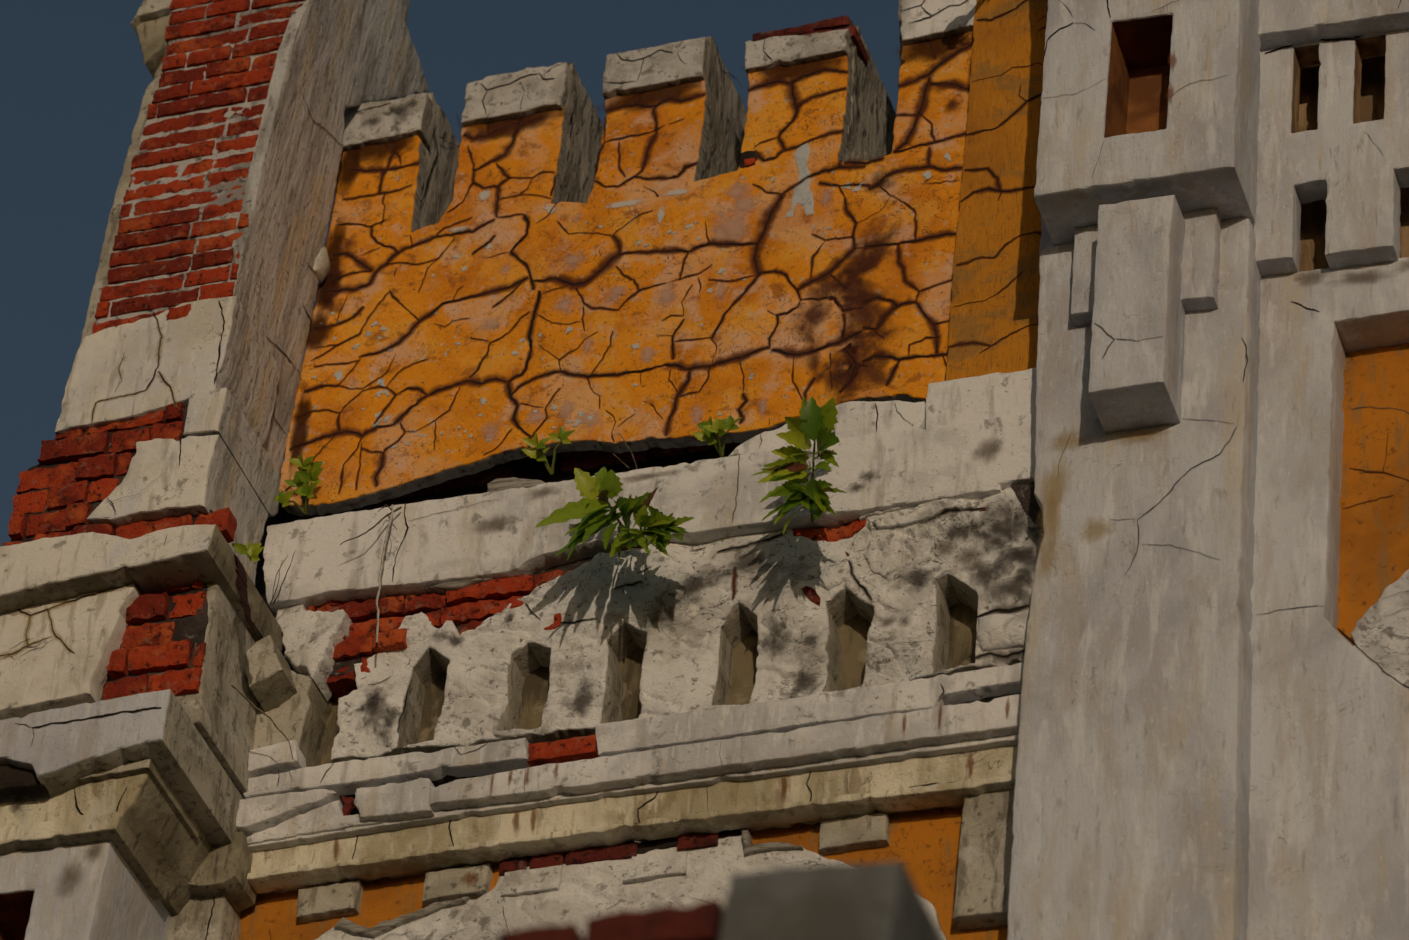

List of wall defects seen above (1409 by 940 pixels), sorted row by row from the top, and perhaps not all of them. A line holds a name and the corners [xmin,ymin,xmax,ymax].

flaking render [784,142,864,217]
crack [214,0,1111,600]
crack [92,312,181,512]
spalling [792,498,987,556]
spalling [1011,482,1044,534]
crack [1110,418,1237,576]
crack [1342,406,1409,509]
crack [0,584,129,660]
spalling [307,557,594,702]
crack [525,566,652,624]
flaking render [1350,569,1409,691]
flaking render [315,829,846,940]